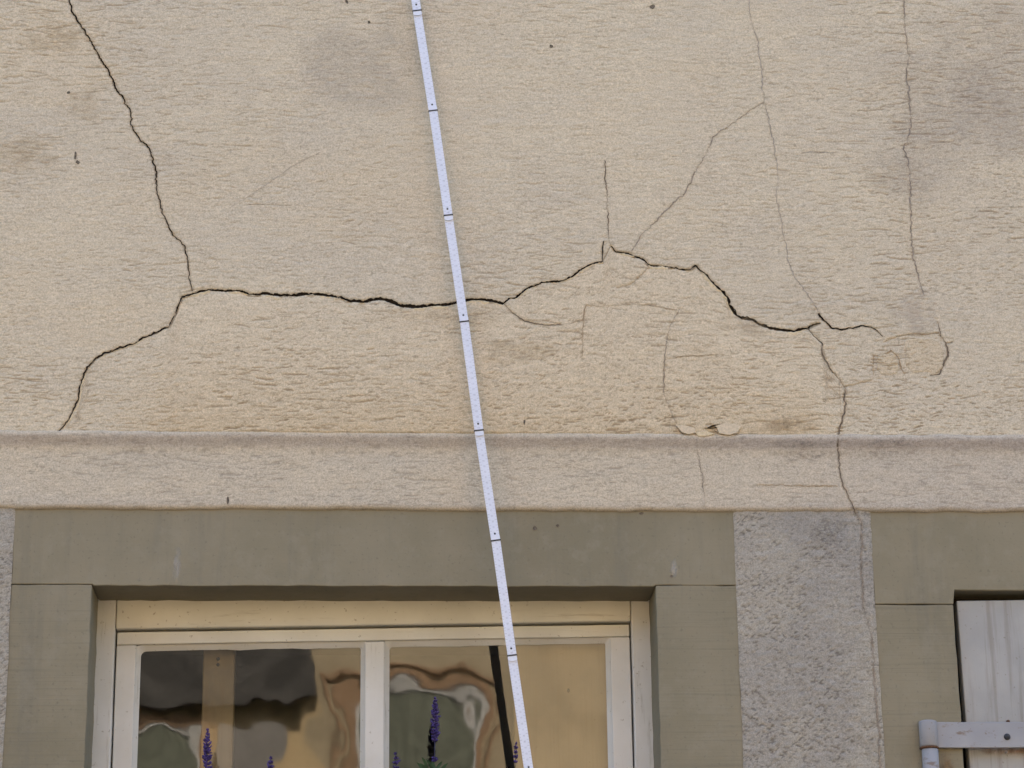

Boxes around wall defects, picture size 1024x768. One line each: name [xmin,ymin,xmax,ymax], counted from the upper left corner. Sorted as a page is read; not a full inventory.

crack [903,0,925,296]
crack [59,0,882,617]
spalling [676,423,741,436]
crack [871,634,881,768]